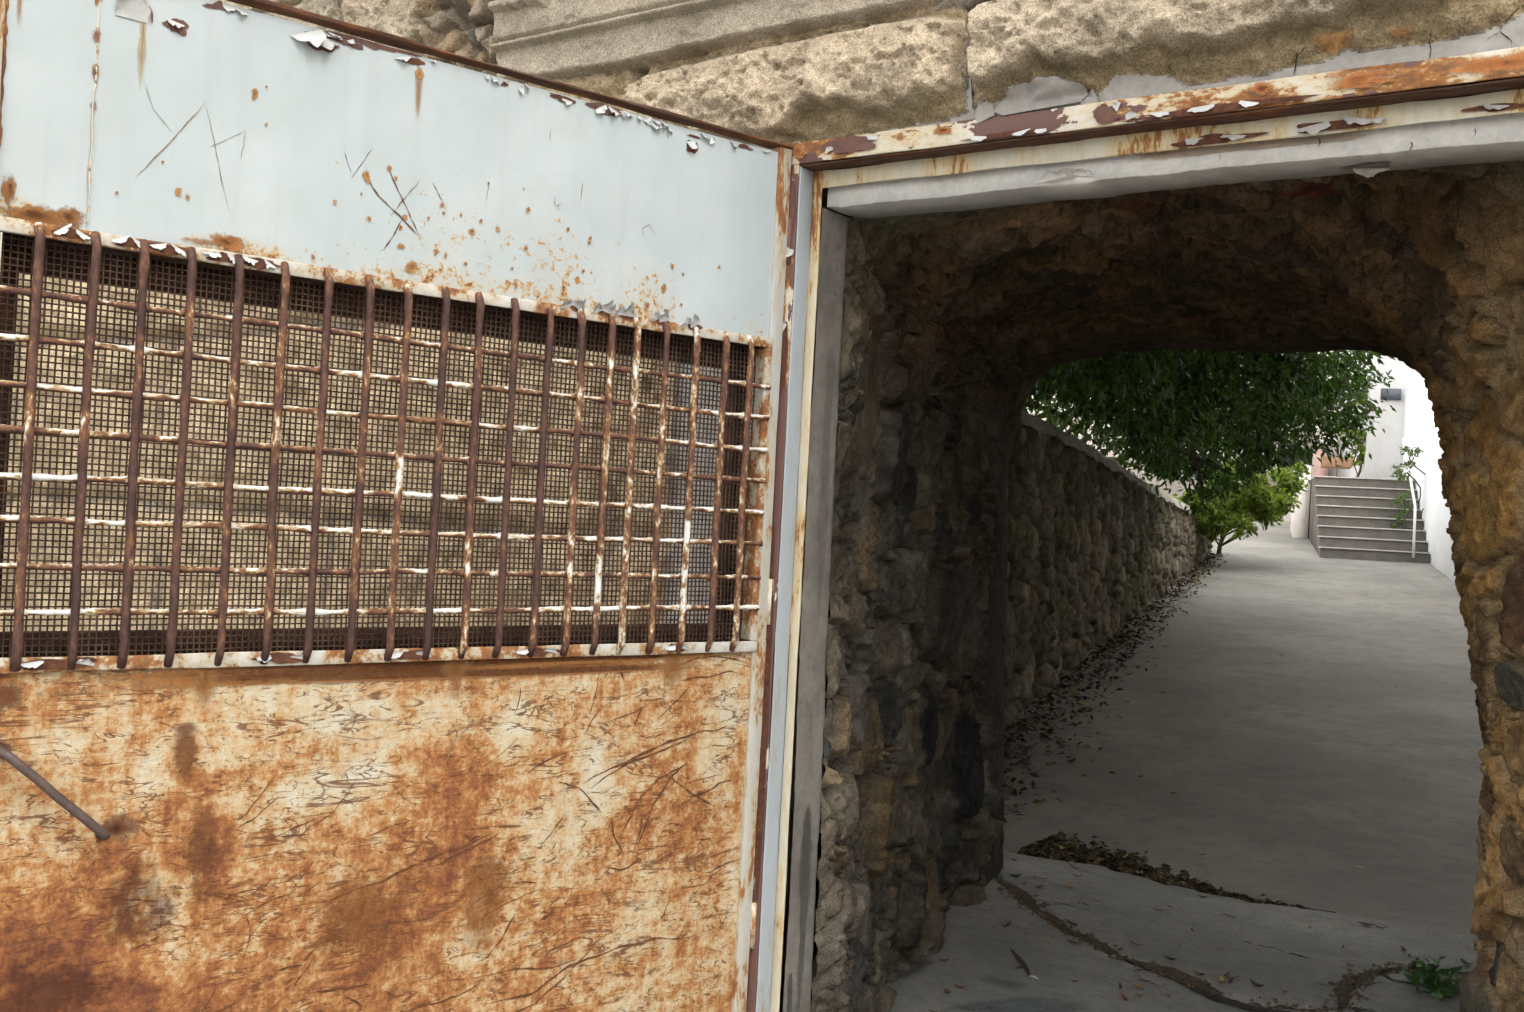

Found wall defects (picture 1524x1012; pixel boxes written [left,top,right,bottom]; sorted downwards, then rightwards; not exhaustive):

peeling [115,0,189,36]
peeling [202,0,248,15]
spalling [290,0,530,94]
corrosion [415,68,424,110]
spalling [550,0,1524,154]
corrosion [1448,51,1524,76]
peeling [1342,162,1390,178]
corrosion [0,176,84,229]
corrosion [184,234,245,252]
corrosion [51,652,731,699]
corrosion [176,723,198,775]
crack [995,861,1415,1012]